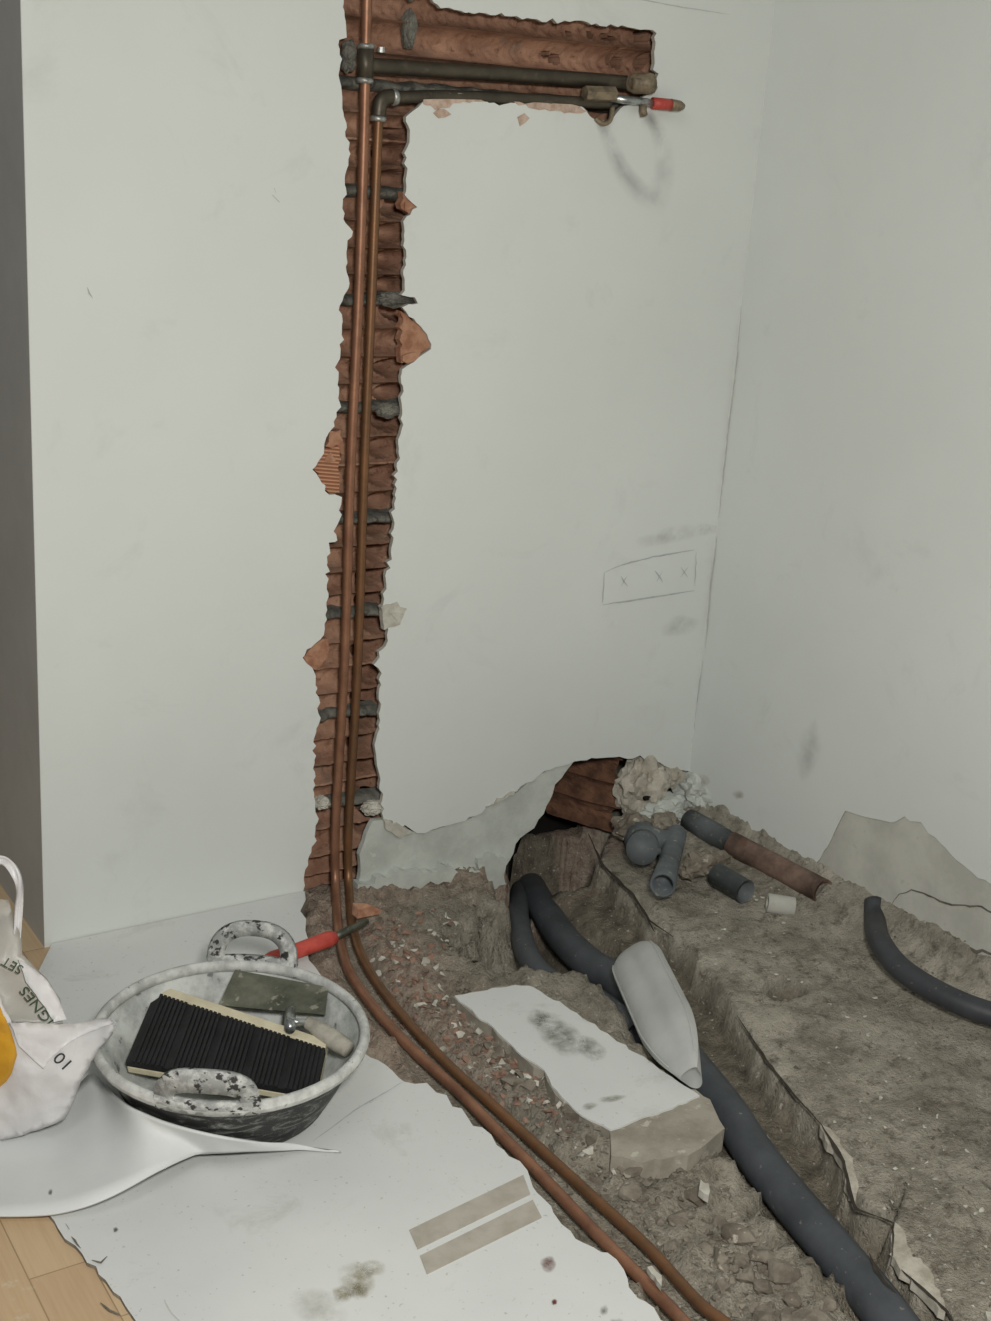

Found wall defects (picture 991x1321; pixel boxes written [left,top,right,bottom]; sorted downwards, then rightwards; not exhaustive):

spalling [423,93,485,118]
spalling [515,102,586,126]
spalling [395,191,415,214]
spalling [395,310,430,364]
spalling [312,428,344,494]
spalling [378,602,406,630]
spalling [303,636,329,670]
flaking render [353,755,713,890]
peeling [818,811,991,957]
flaking render [698,1180,710,1203]
flaking render [647,1266,662,1291]